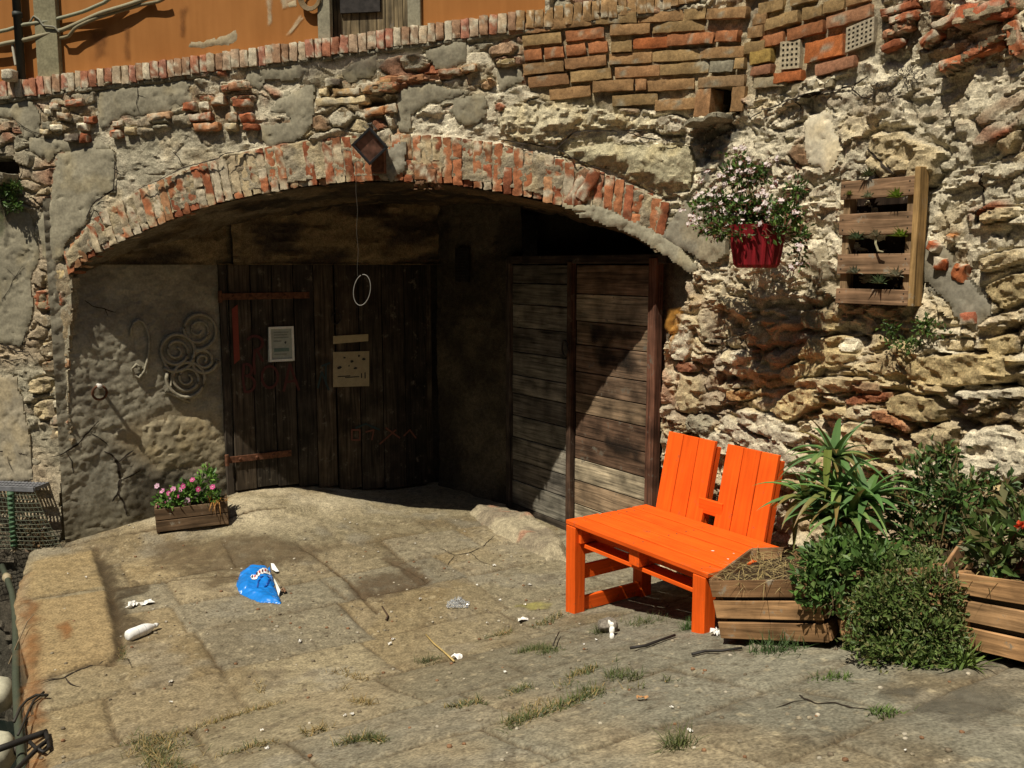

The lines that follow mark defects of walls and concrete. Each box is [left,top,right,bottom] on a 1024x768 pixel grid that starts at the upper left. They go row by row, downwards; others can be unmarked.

spalling [723,86,740,115]
flaking render [804,110,845,172]
flaking render [0,36,524,443]
flaking render [923,233,1002,330]
flaking render [0,375,40,482]
crack [0,421,141,515]